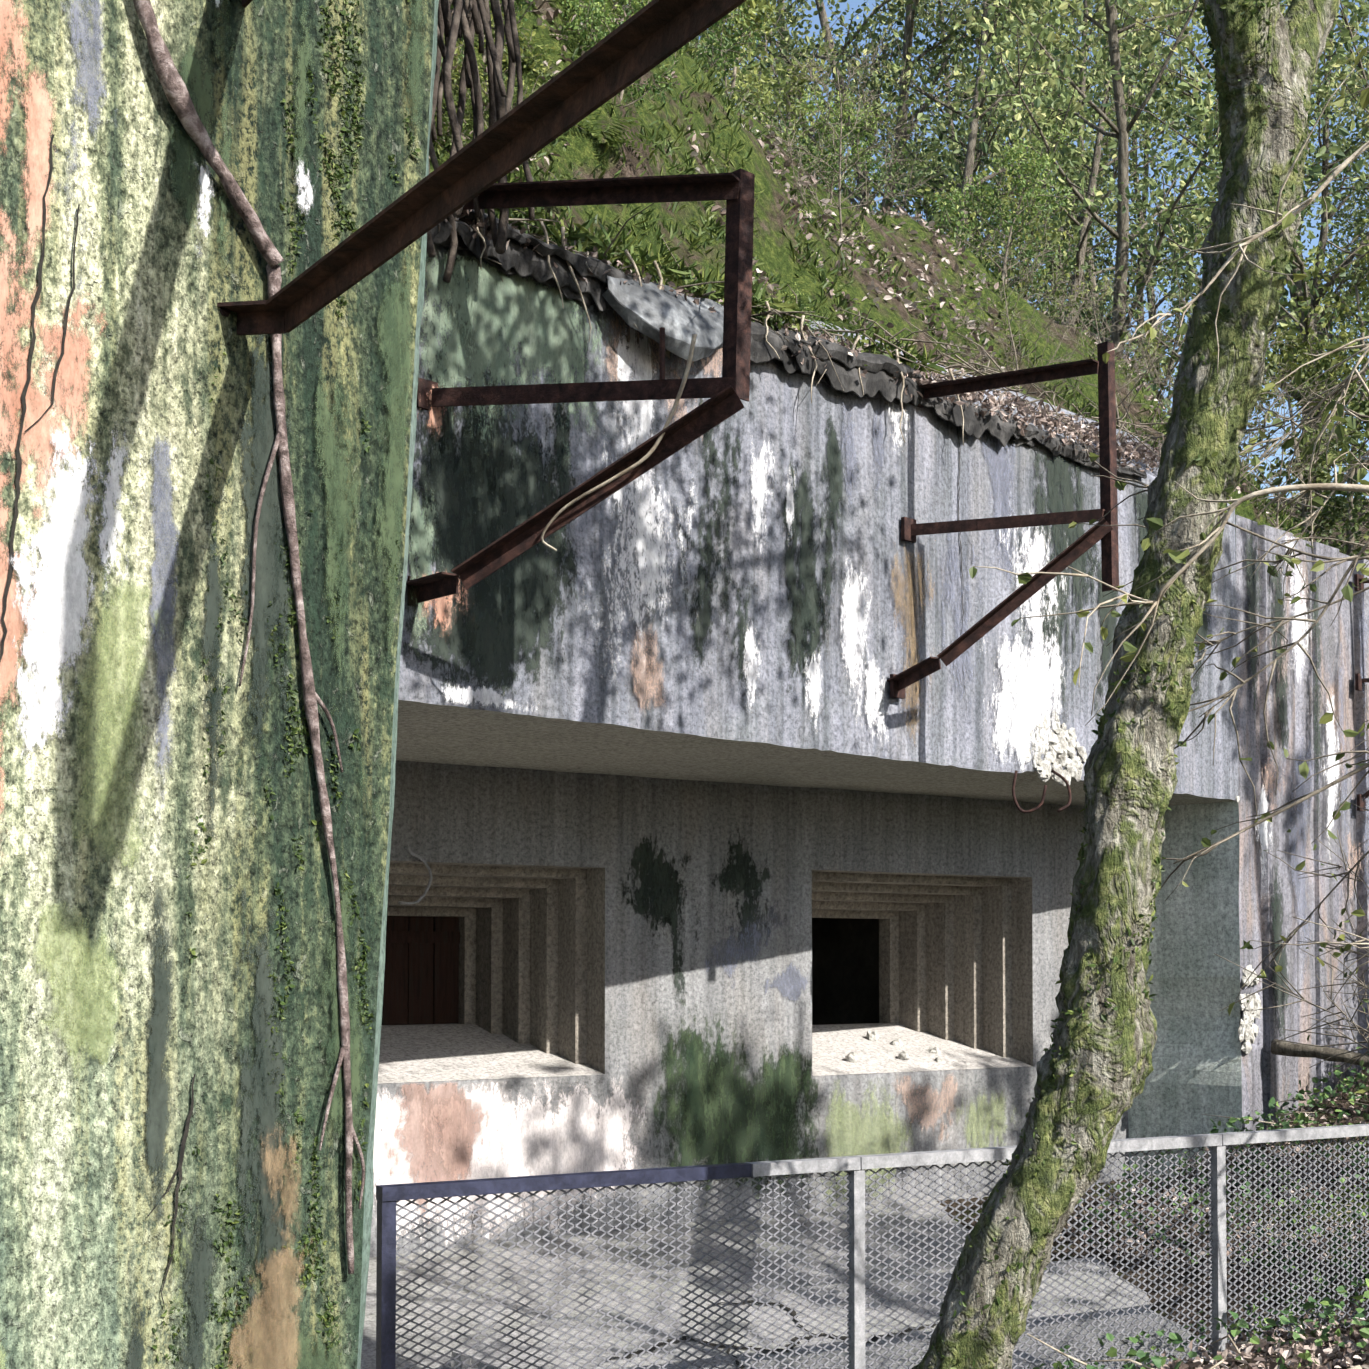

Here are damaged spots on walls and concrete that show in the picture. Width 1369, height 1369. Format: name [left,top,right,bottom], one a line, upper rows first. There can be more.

crack [0,134,80,662]
rust [0,0,104,702]
damp [314,249,655,708]
damp [621,829,787,1002]
damp [607,406,886,738]
damp [765,963,808,1002]
damp [873,404,910,489]
rust [891,544,934,734]
damp [942,533,975,699]
damp [1246,525,1369,1040]